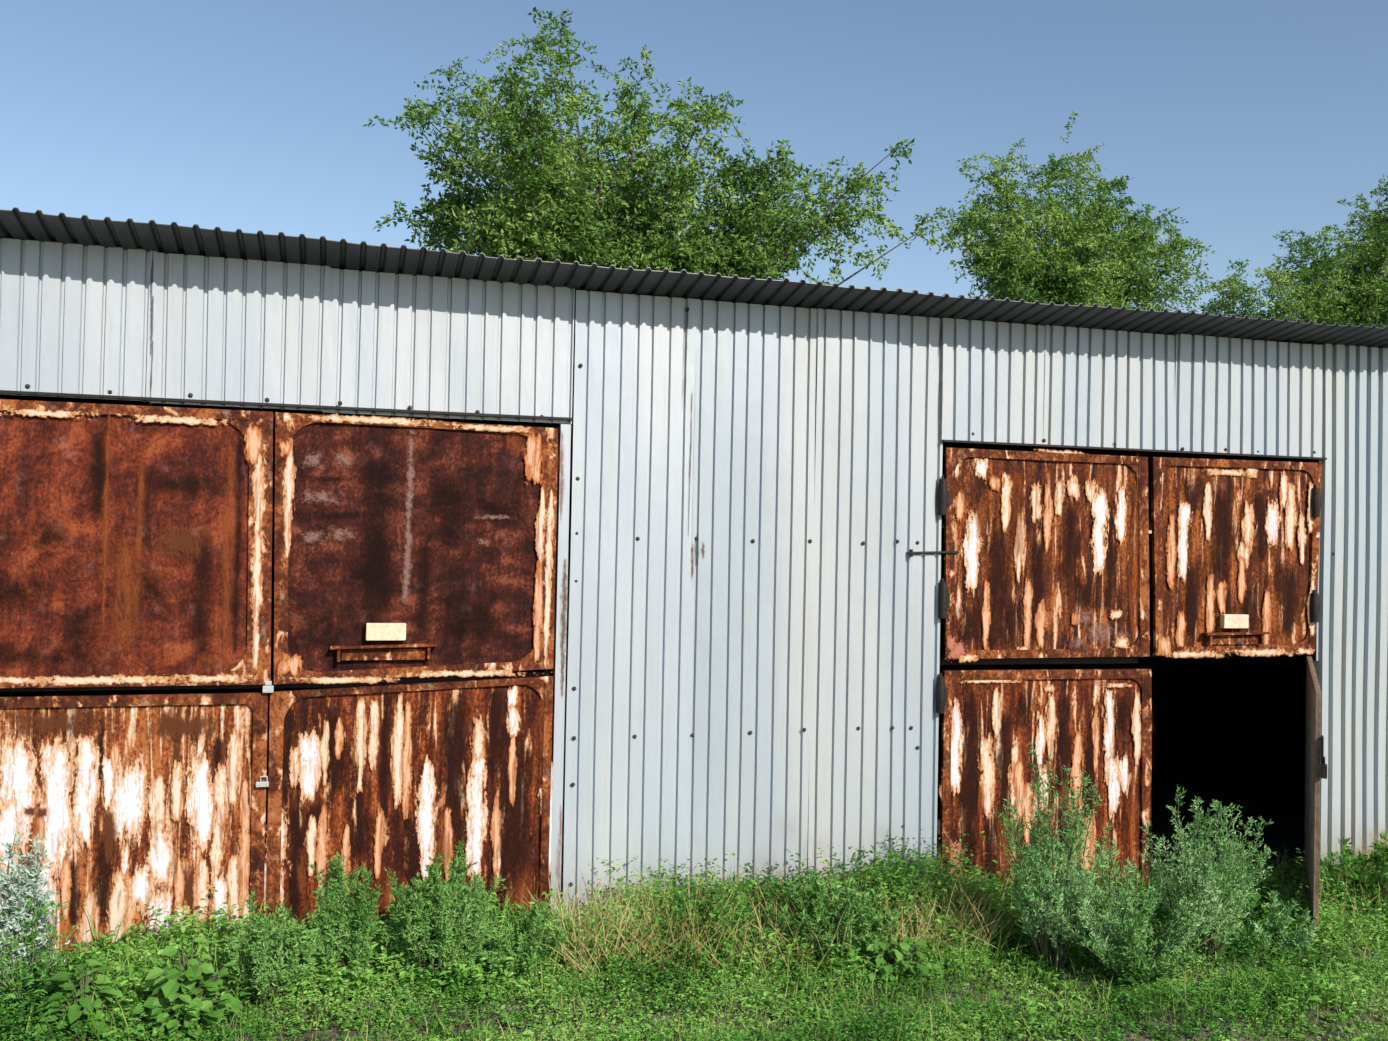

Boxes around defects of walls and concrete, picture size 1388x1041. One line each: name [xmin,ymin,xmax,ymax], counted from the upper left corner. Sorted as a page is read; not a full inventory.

rust [957,477,1116,650]
peeling [945,457,1130,663]
peeling [1165,468,1259,592]
rust [1185,476,1259,635]
peeling [1206,472,1314,633]
rust [69,812,117,926]
peeling [0,407,555,950]
rust [489,690,544,906]
rust [958,685,1037,888]
peeling [939,679,1057,847]
rust [1053,695,1101,861]
peeling [1070,683,1142,871]